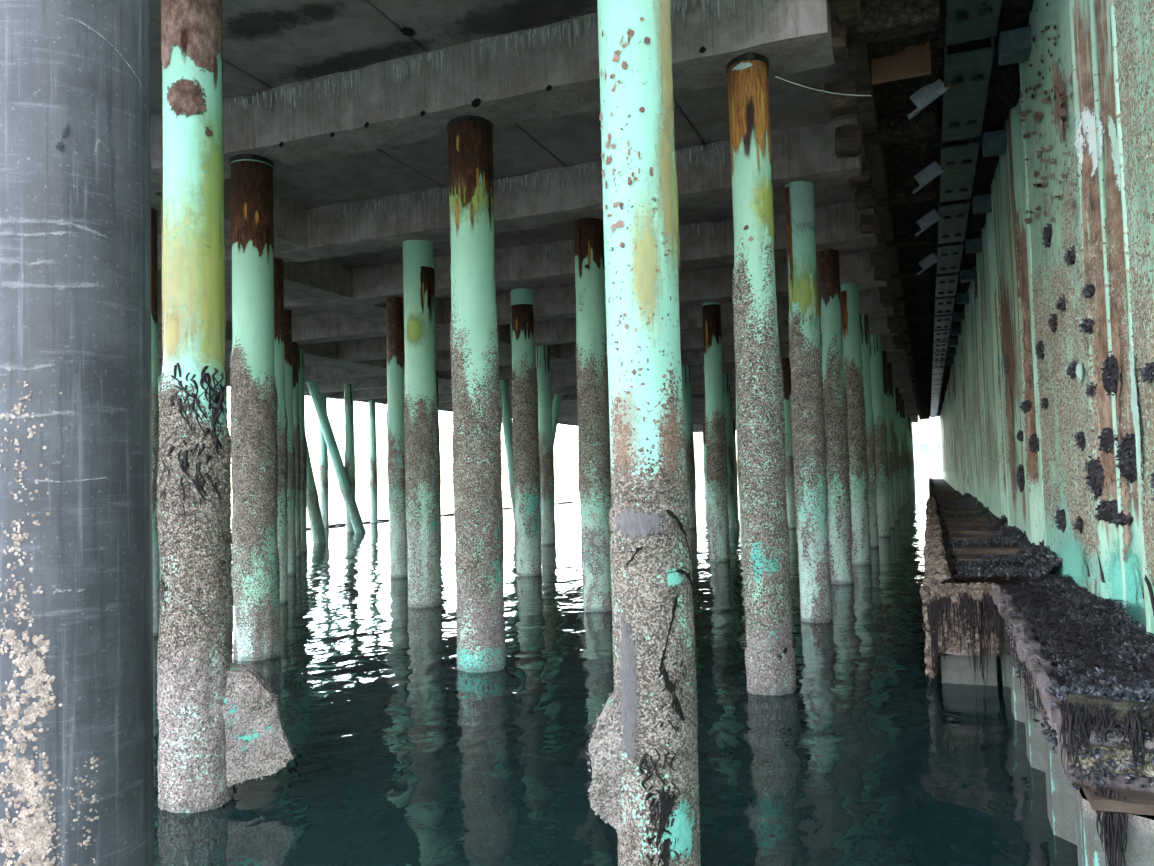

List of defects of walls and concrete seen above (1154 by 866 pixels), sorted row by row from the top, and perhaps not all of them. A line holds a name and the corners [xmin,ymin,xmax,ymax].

rust [161,0,223,117]
rust [230,160,274,259]
rust [420,266,435,319]
rust [448,121,494,230]
rust [573,218,605,279]
rust [727,60,772,172]
rust [997,231,1038,525]
peeling [1018,25,1121,224]
rust [1079,122,1132,562]
crack [625,547,644,568]
crack [659,509,695,721]
crack [658,791,676,866]